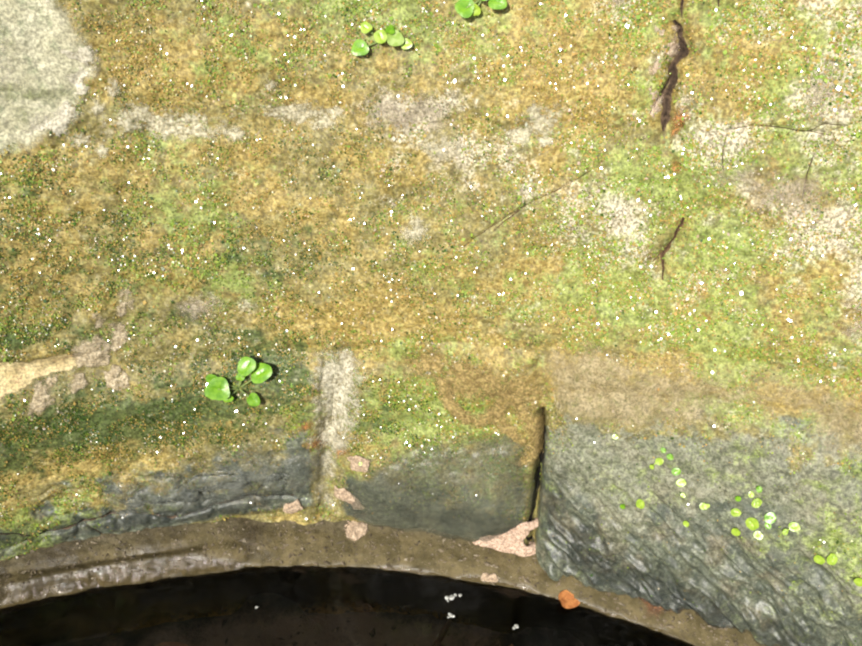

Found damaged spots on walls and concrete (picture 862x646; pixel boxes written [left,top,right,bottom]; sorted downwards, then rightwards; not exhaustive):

crack [646,0,690,139]
crack [722,121,860,174]
crack [463,164,600,247]
crack [652,217,685,280]